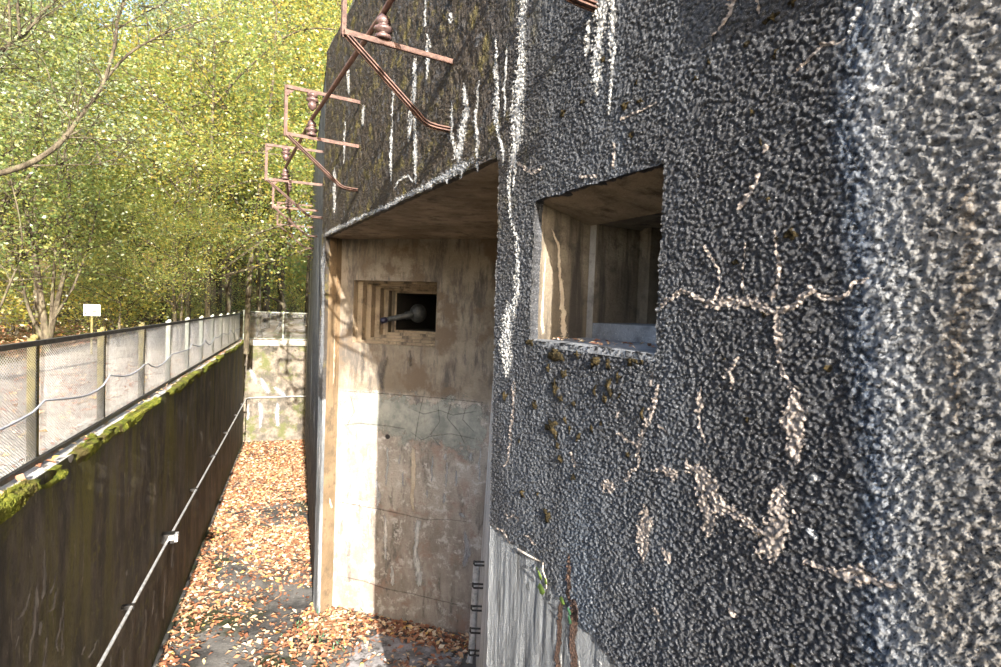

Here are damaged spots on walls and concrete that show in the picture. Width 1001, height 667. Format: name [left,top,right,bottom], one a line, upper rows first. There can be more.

efflorescence [328,0,480,234]
efflorescence [492,0,527,378]
efflorescence [584,0,617,111]
efflorescence [305,229,319,433]
crack [660,226,876,467]
corrosion [554,554,579,667]